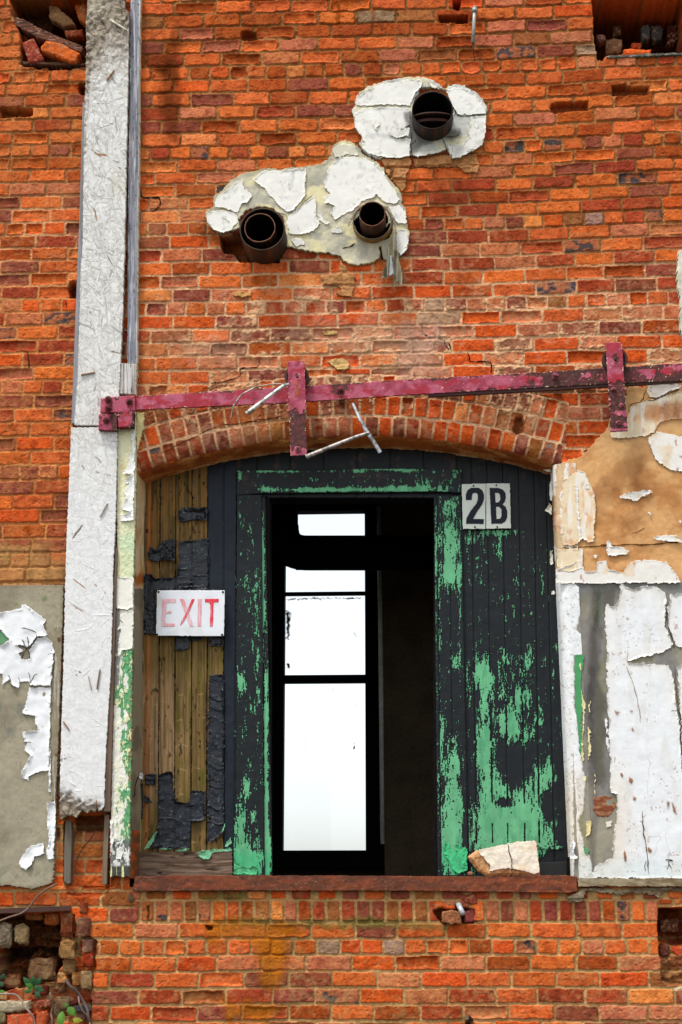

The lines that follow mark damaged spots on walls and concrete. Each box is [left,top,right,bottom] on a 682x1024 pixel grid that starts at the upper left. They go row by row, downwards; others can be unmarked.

peeling [207,79,486,255]
peeling [0,604,56,870]
peeling [569,584,682,879]